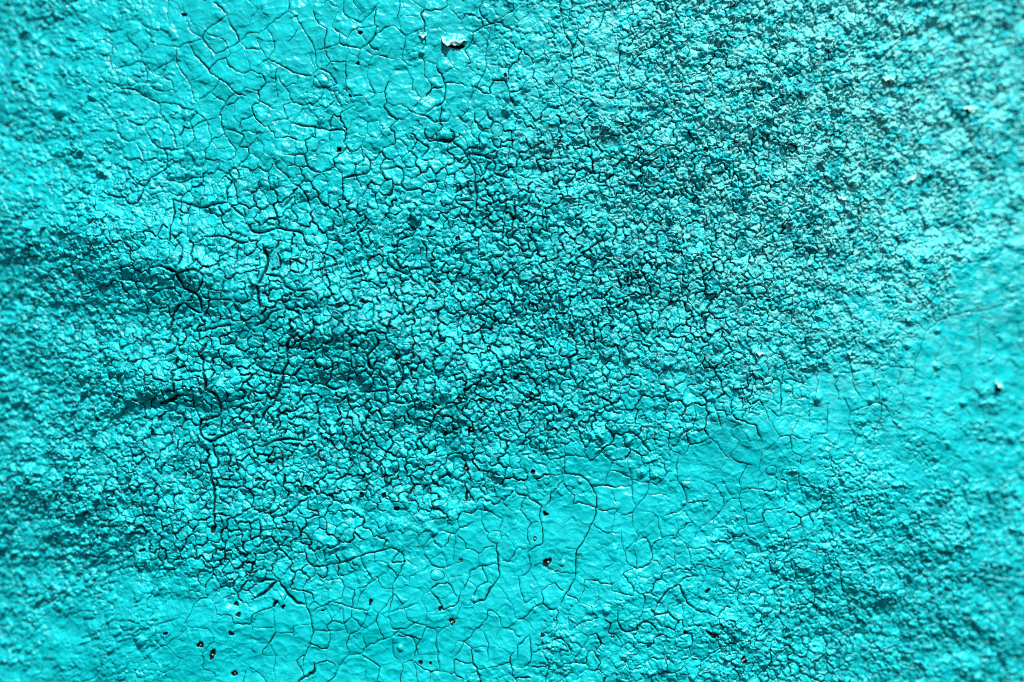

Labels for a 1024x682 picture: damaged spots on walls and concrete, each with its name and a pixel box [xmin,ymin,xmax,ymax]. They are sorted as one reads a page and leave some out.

crack [967,0,1024,69]
crack [0,48,92,126]
crack [1,163,30,206]
crack [875,313,943,367]
crack [947,288,1024,351]
crack [935,329,1023,419]
crack [952,424,1024,492]
crack [913,470,970,512]
crack [0,558,110,679]
crack [90,600,135,655]
crack [260,614,278,675]